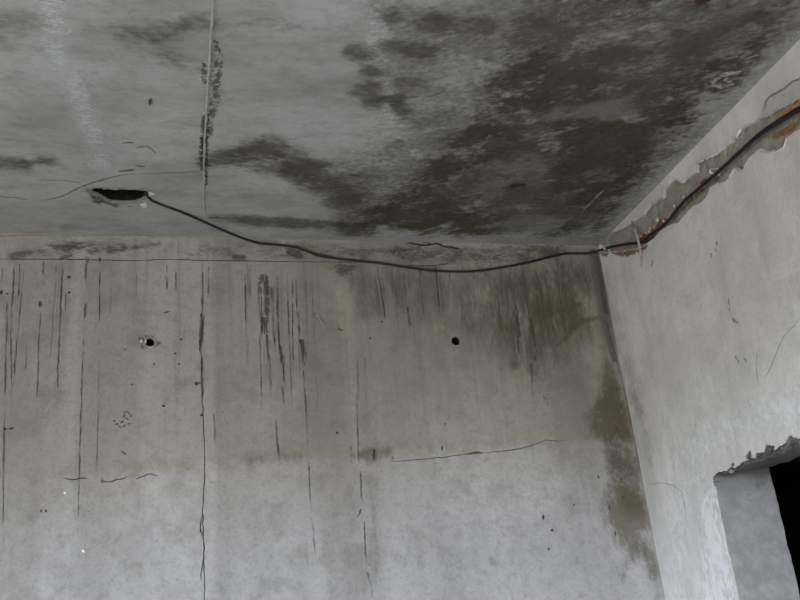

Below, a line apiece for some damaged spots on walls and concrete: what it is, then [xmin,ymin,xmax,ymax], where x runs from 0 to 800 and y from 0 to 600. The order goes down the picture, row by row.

damp [199,0,800,246]
crack [47,142,198,200]
flaking render [603,78,800,255]
crack [406,242,458,266]
corrosion [601,245,647,257]
crack [19,258,364,323]
damp [259,274,307,400]
crack [389,440,564,462]
damp [591,369,646,553]
flaking render [744,434,800,465]